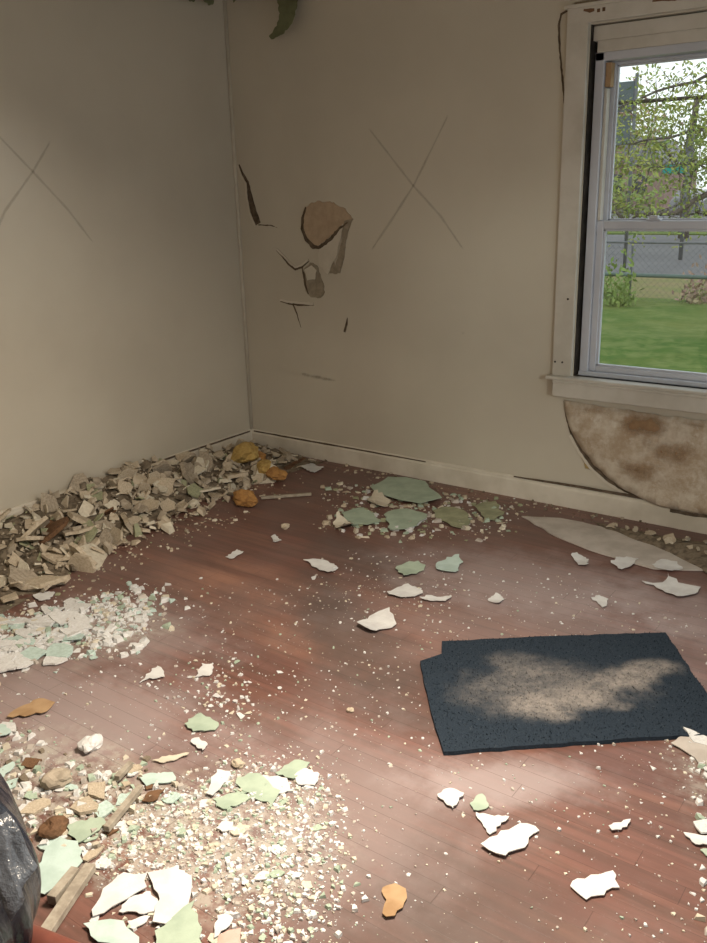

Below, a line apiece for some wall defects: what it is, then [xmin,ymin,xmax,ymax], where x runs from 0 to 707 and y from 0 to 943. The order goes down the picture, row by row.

peeling [269,0,298,39]
crack [237,164,309,270]
flaking render [301,201,353,298]
crack [280,299,314,327]